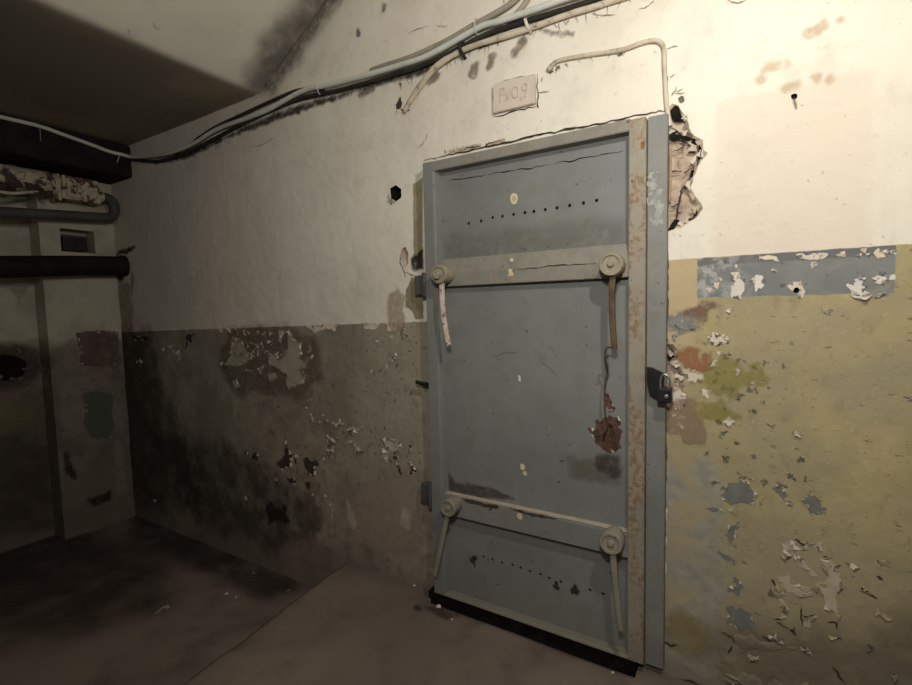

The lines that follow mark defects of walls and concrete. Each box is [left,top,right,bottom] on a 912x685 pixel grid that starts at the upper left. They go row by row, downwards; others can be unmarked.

mould [261,0,336,90]
peeling [706,255,779,313]
peeling [787,281,805,299]
peeling [796,248,897,269]
peeling [846,270,895,300]
spalling [667,318,771,430]
peeling [218,327,364,506]
rust [588,394,622,453]
peeling [715,407,735,436]
peeling [380,437,417,476]
peeling [705,472,827,515]
peeling [768,537,861,627]